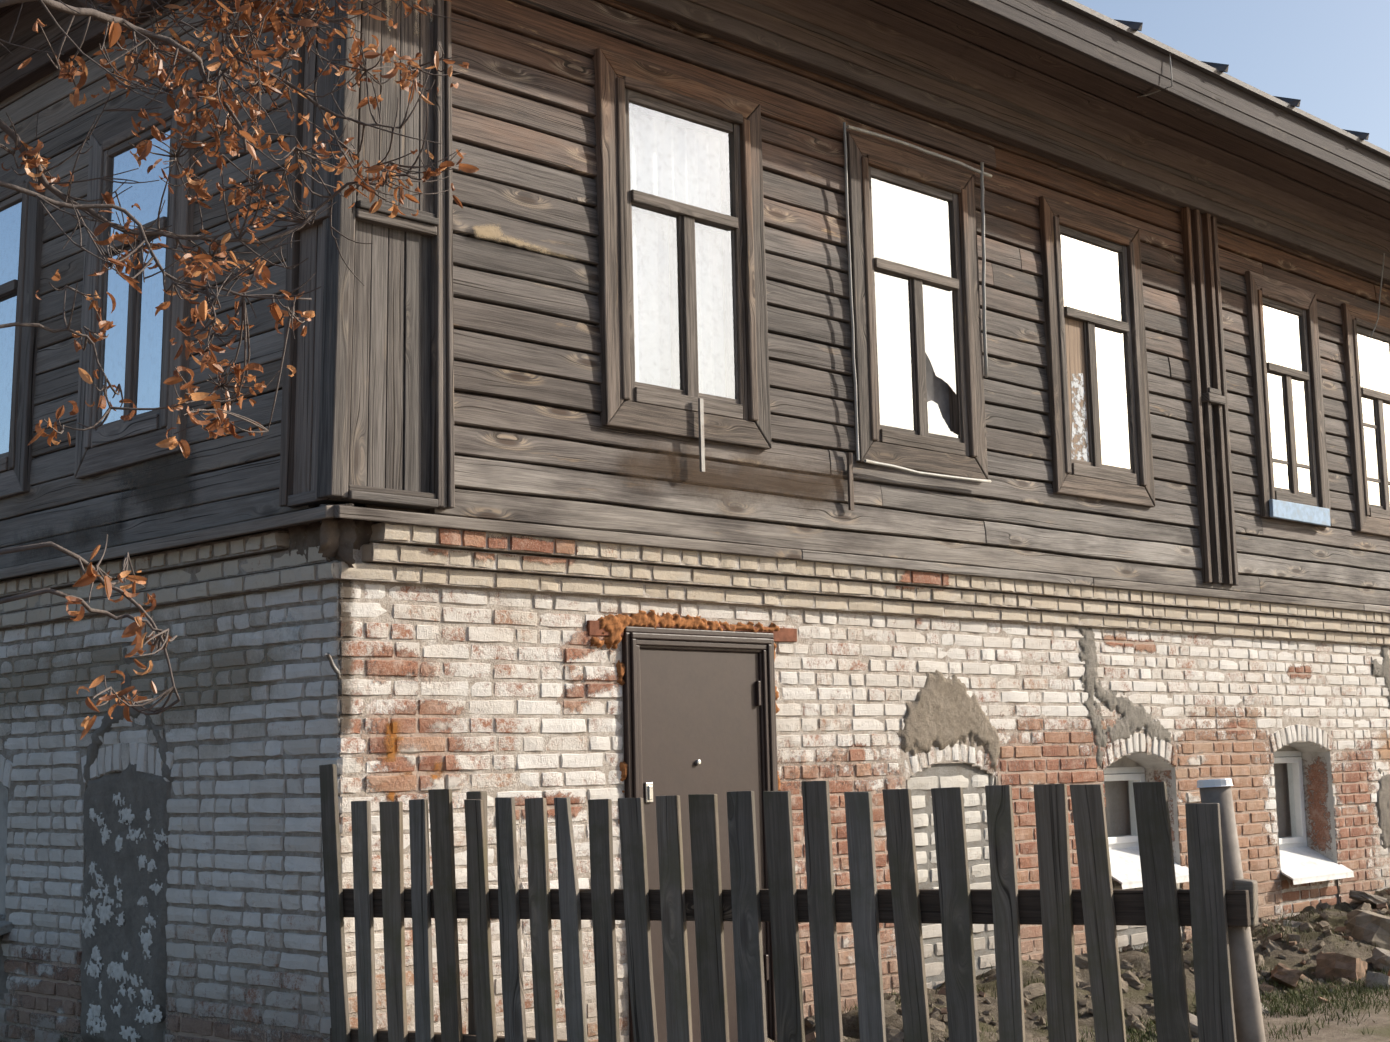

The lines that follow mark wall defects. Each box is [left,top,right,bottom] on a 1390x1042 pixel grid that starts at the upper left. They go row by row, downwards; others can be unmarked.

crack [83,642,175,784]
peeling [352,645,468,801]
peeling [556,624,621,715]
crack [1075,626,1171,768]
peeling [777,721,905,889]
peeling [982,708,1123,889]
peeling [1145,687,1283,920]
peeling [4,792,330,1042]
peeling [798,922,815,1020]
peeling [836,923,858,1013]
peeling [879,923,900,993]
peeling [1020,924,1044,960]